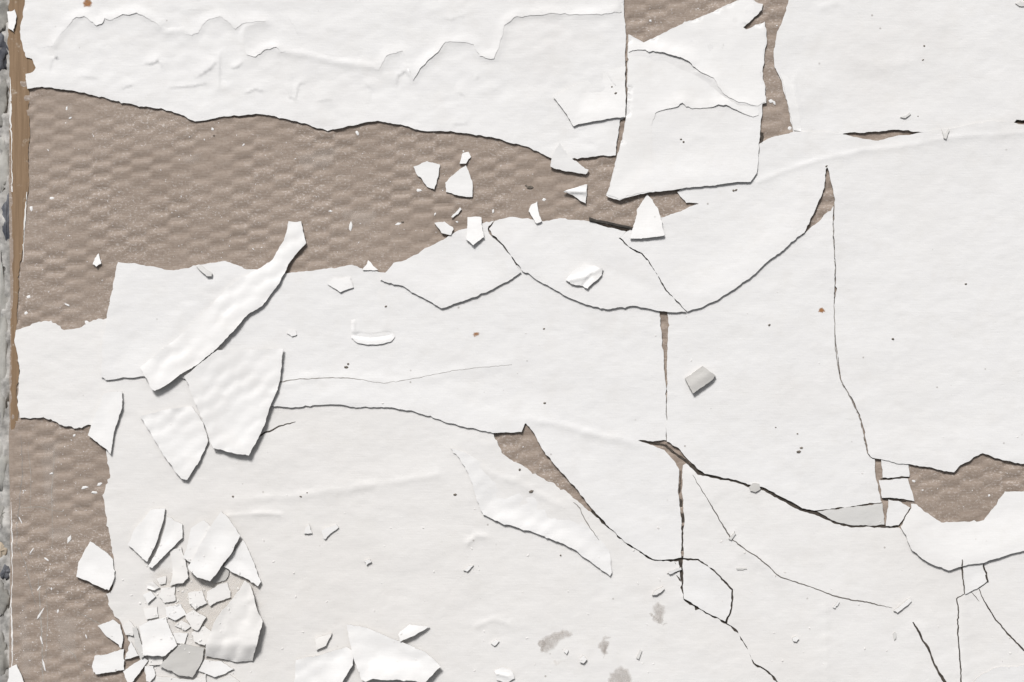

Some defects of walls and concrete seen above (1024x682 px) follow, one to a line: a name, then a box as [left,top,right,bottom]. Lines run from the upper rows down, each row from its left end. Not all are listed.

peeling [16,0,767,576]
peeling [620,0,1024,570]
crack [833,205,869,455]
peeling [7,391,164,682]
crack [573,406,911,682]
crack [912,560,1024,682]